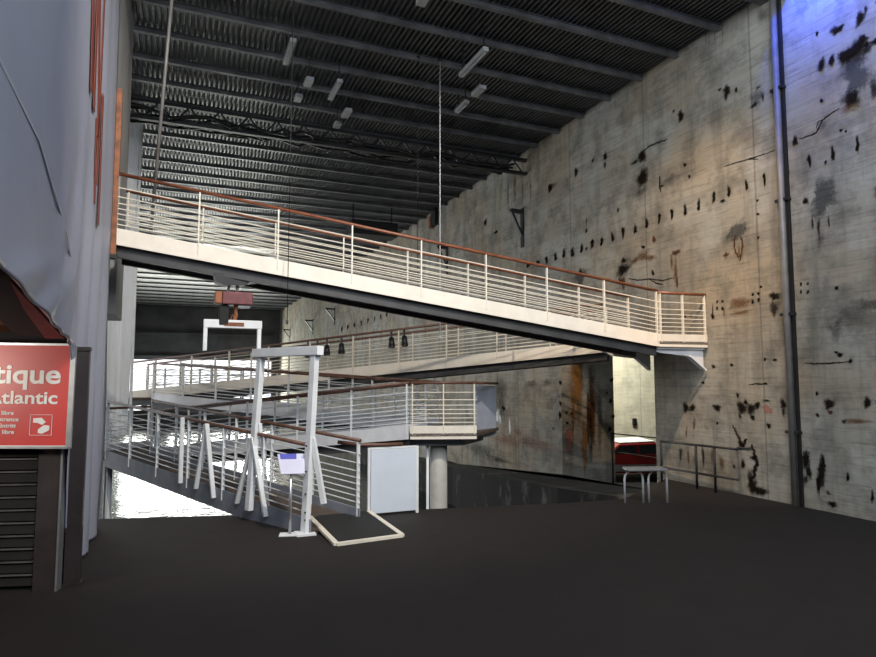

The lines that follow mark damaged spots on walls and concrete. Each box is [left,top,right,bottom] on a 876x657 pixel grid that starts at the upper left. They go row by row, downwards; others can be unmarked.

crack [724,108,840,167]
corrosion [571,364,595,469]